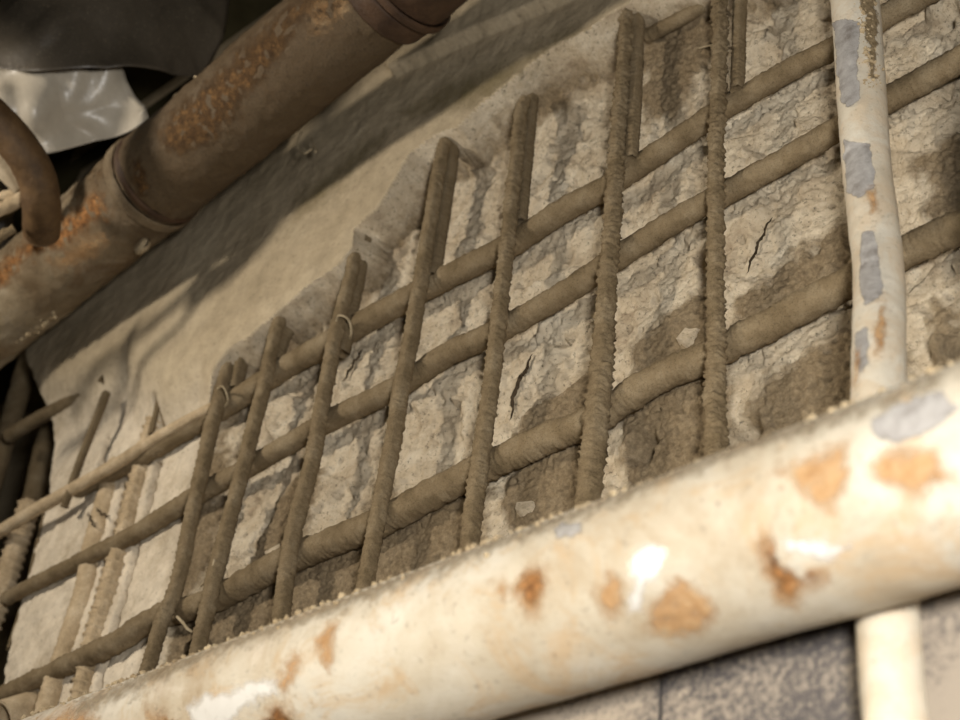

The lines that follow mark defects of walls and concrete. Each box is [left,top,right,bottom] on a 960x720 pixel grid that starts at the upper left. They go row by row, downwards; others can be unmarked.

spalling [880,0,960,381]
crack [747,218,772,273]
peeling [859,231,883,305]
spalling [186,0,860,656]
peeling [871,390,959,443]
rust [792,448,848,504]
rust [873,450,945,493]
spalling [0,349,252,712]
rust [515,572,544,609]
rust [652,578,712,636]
rust [761,538,814,605]
peeling [188,680,276,720]